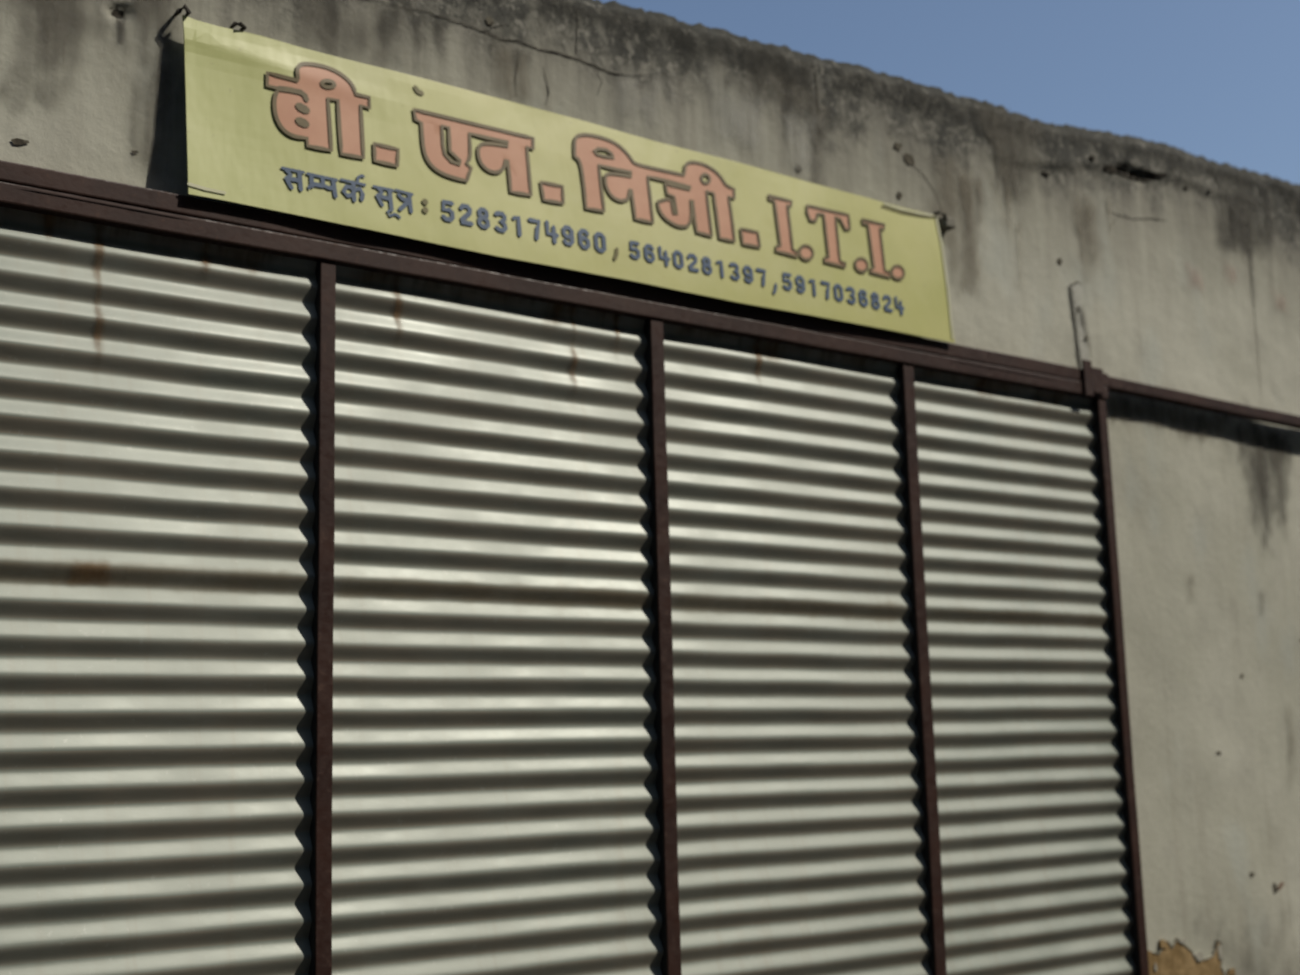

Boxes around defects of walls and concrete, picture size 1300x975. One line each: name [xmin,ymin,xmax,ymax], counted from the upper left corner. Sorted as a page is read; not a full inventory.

crack [372,0,649,104]
leakage [1246,431,1286,525]
peeling [1148,938,1235,975]